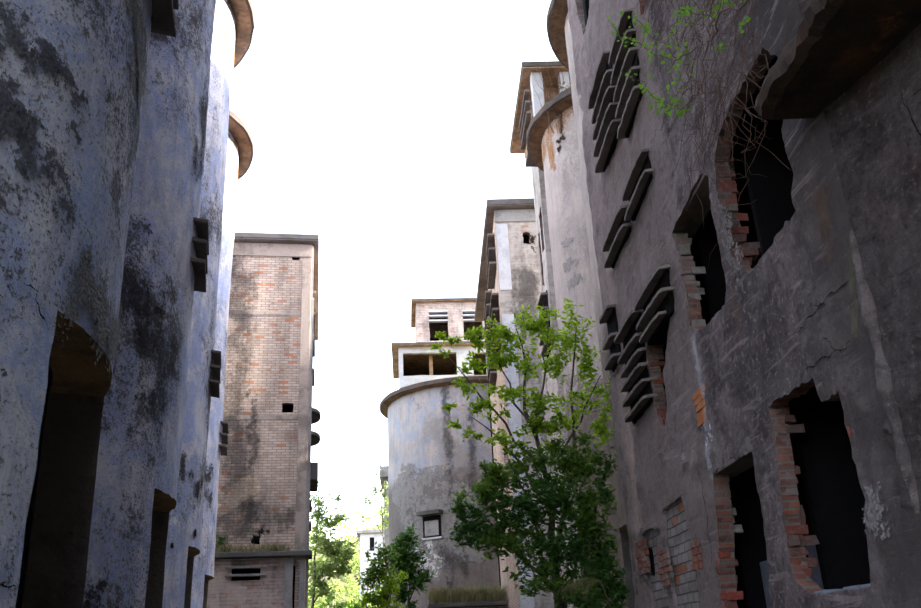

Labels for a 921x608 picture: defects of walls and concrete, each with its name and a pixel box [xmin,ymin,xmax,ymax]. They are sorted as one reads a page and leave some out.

crack [900,89,921,136]
spalling [715,191,746,294]
crack [792,271,855,336]
water stain [119,259,179,433]
crack [805,338,850,370]
water stain [216,265,294,539]
flaking render [692,382,708,432]
flaking render [633,528,674,598]